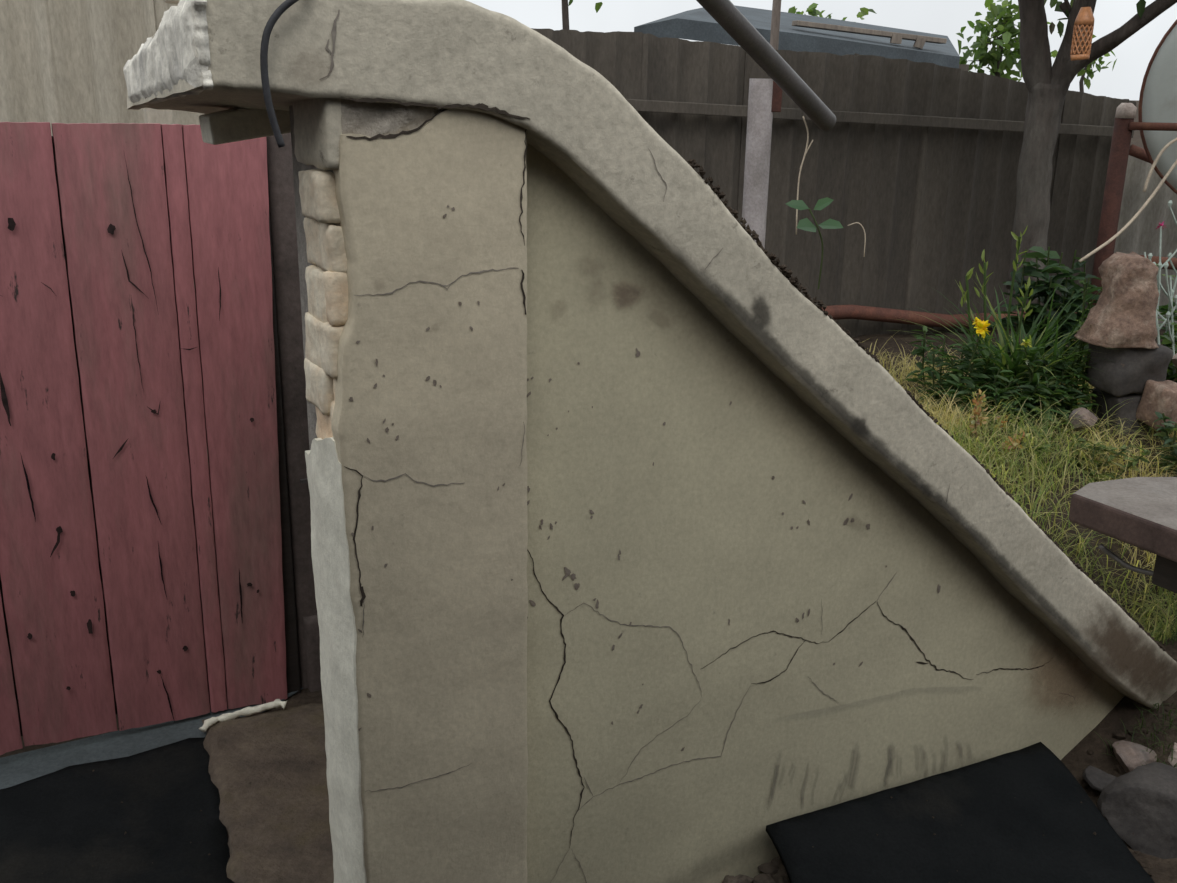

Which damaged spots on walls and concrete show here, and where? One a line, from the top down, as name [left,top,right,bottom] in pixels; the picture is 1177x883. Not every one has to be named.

crack [319,10,340,80]
crack [346,98,530,315]
crack [344,466,464,635]
crack [527,549,1050,883]